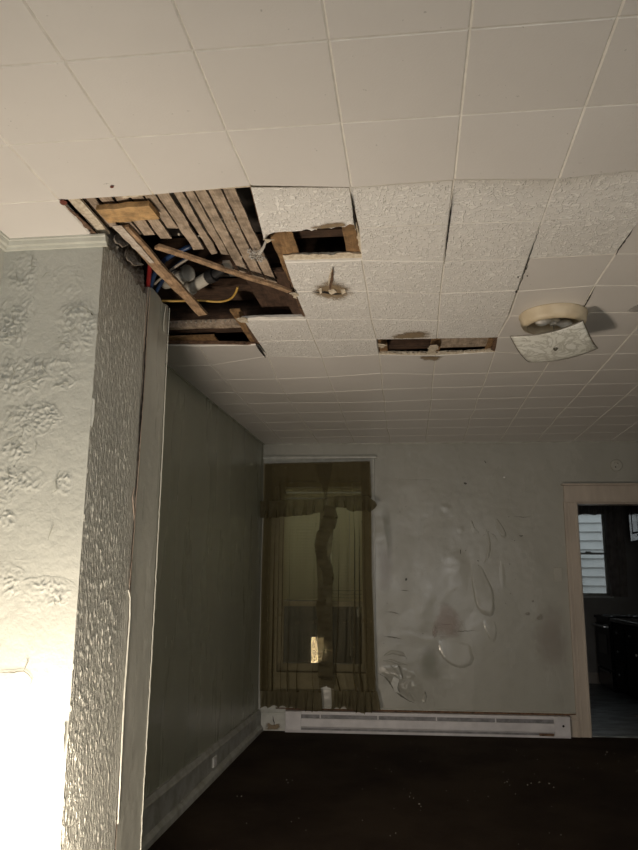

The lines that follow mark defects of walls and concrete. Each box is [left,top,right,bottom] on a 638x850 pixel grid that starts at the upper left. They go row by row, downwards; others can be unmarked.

spalling [98,216,145,291]
crack [515,226,541,293]